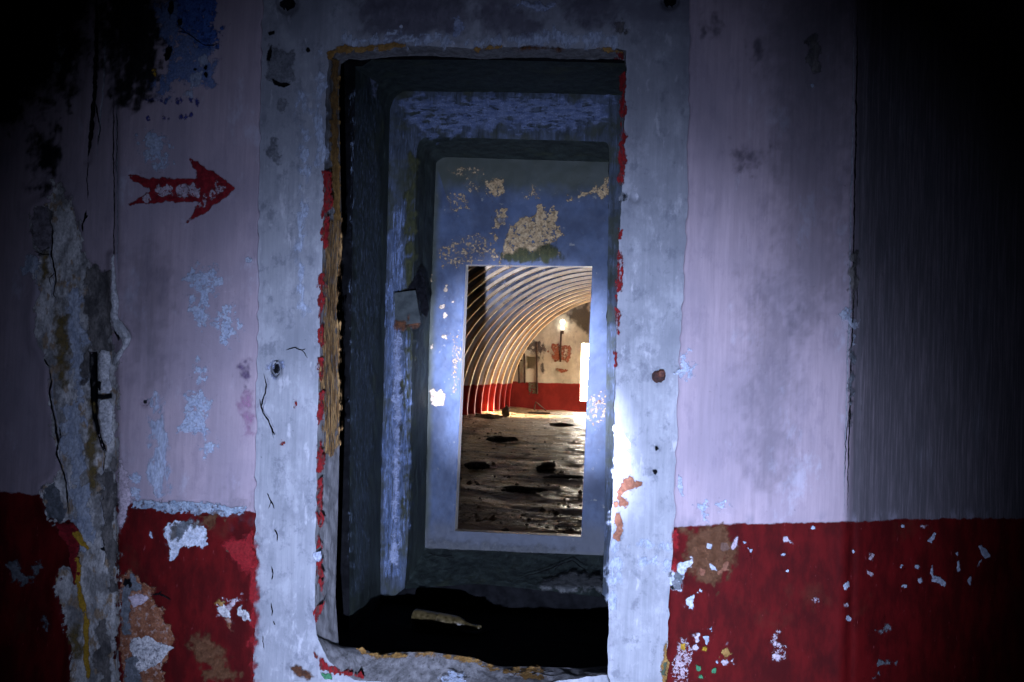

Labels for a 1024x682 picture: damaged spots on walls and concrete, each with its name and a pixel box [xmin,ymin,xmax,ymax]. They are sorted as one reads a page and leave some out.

peeling [150,0,225,103]
peeling [567,177,627,202]
peeling [395,167,564,318]
crack [44,359,71,517]
flaking render [20,179,259,682]
crack [260,376,276,438]
peeling [669,474,752,609]
peeling [900,565,946,588]
peeling [672,628,733,682]
peeling [770,630,787,661]